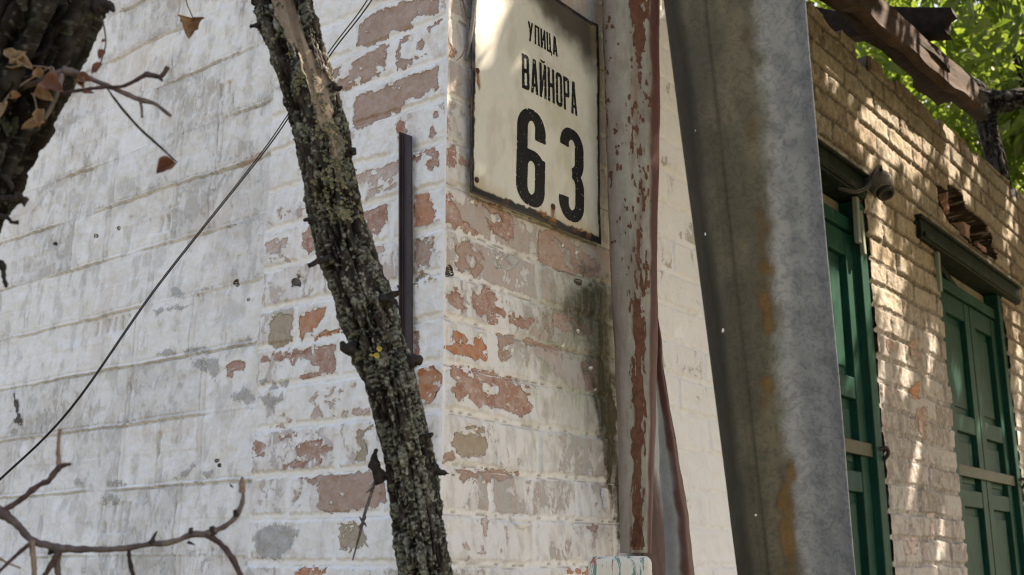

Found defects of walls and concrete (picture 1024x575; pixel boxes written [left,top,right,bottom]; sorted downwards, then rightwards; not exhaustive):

peeling [332,0,449,140]
peeling [265,202,315,287]
peeling [356,160,399,253]
peeling [413,192,601,418]
rust [602,0,653,550]
spalling [936,185,998,260]
peeling [581,358,608,392]
peeling [252,440,266,458]
peeling [260,306,387,553]
peeling [442,423,519,484]
peeling [462,515,490,562]